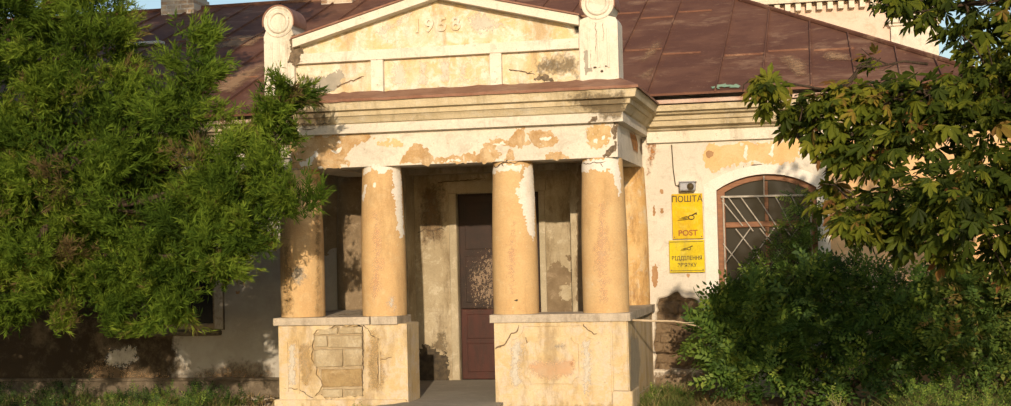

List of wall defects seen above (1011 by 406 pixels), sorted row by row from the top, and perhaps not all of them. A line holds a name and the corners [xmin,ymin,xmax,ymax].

peeling [288,127,569,256]
peeling [547,116,622,312]
peeling [703,138,800,173]
peeling [465,243,493,311]
spalling [651,264,709,371]
peeling [107,346,138,367]
spalling [313,326,365,399]